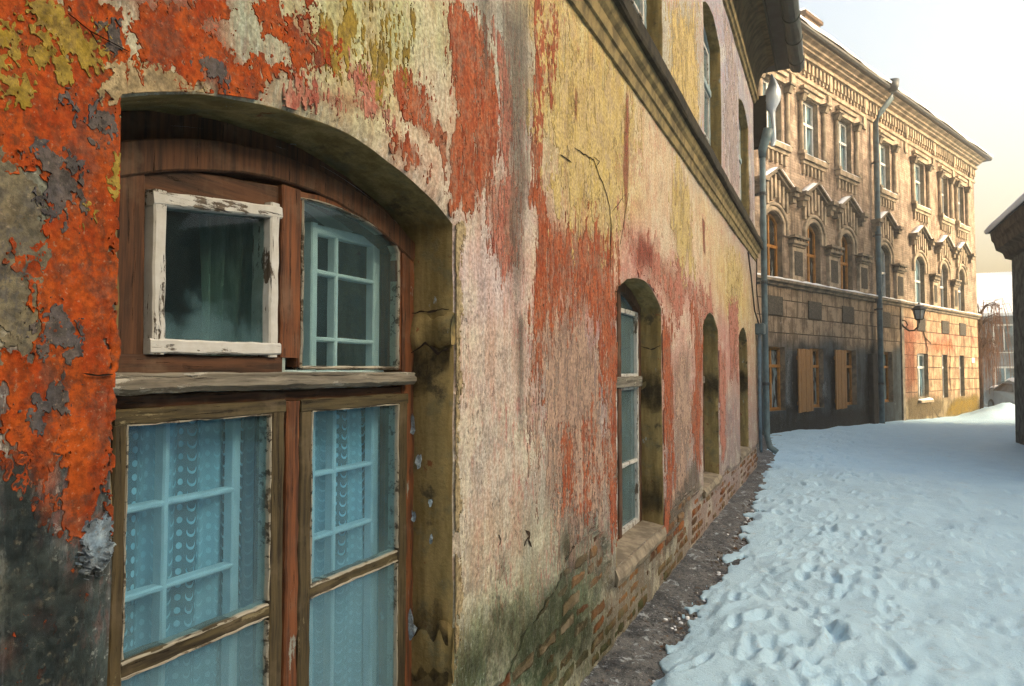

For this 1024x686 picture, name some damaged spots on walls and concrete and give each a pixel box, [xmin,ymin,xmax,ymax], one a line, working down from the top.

peeling [0,0,758,686]
crack [412,307,449,315]
crack [561,148,629,267]
water stain [0,462,89,686]